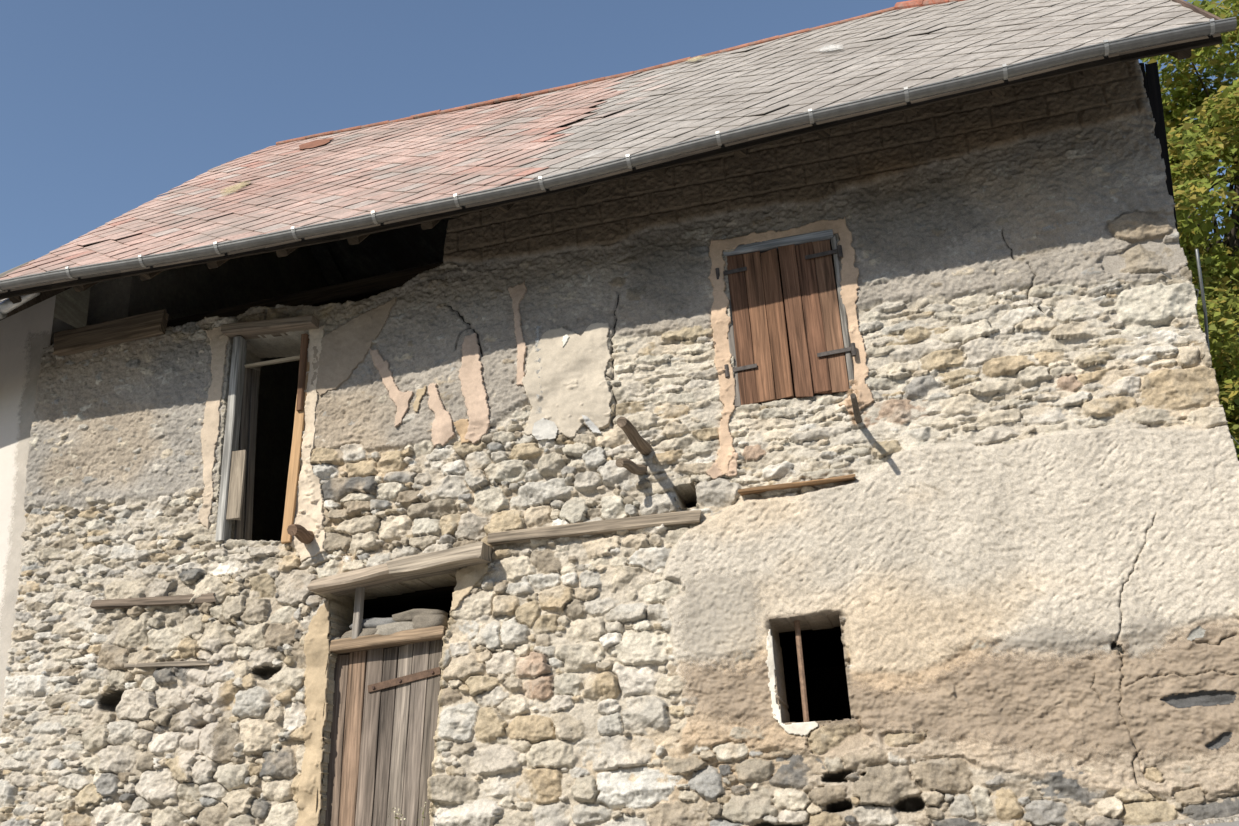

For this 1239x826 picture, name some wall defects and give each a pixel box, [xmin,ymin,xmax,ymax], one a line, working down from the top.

peeling [197,326,230,529]
peeling [287,297,491,562]
peeling [508,281,613,440]
crack [606,295,619,426]
crack [1091,516,1236,801]